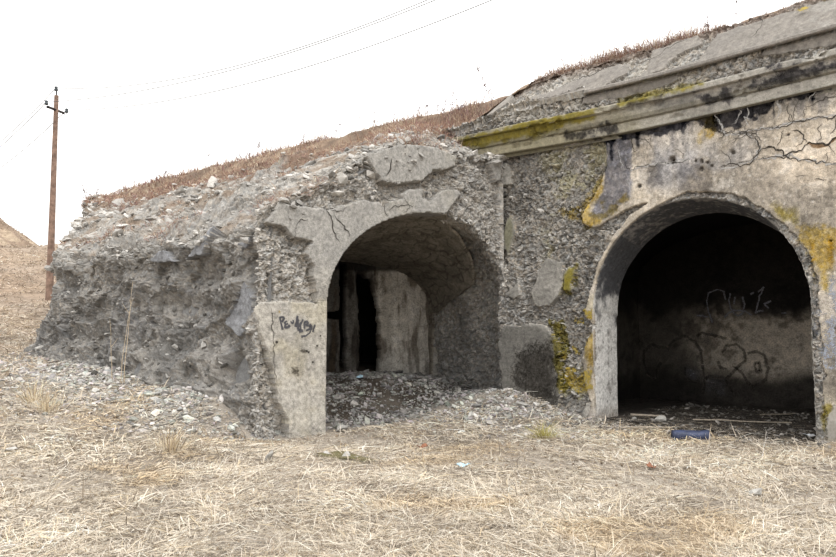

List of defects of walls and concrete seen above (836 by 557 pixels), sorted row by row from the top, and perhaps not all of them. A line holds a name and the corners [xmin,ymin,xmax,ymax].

leakage [750,61,836,90]
crack [625,130,689,171]
leakage [564,86,832,189]
crack [716,94,836,181]
crack [327,207,350,239]
spalling [23,141,652,440]
spalling [664,192,836,442]
leakage [513,341,566,405]